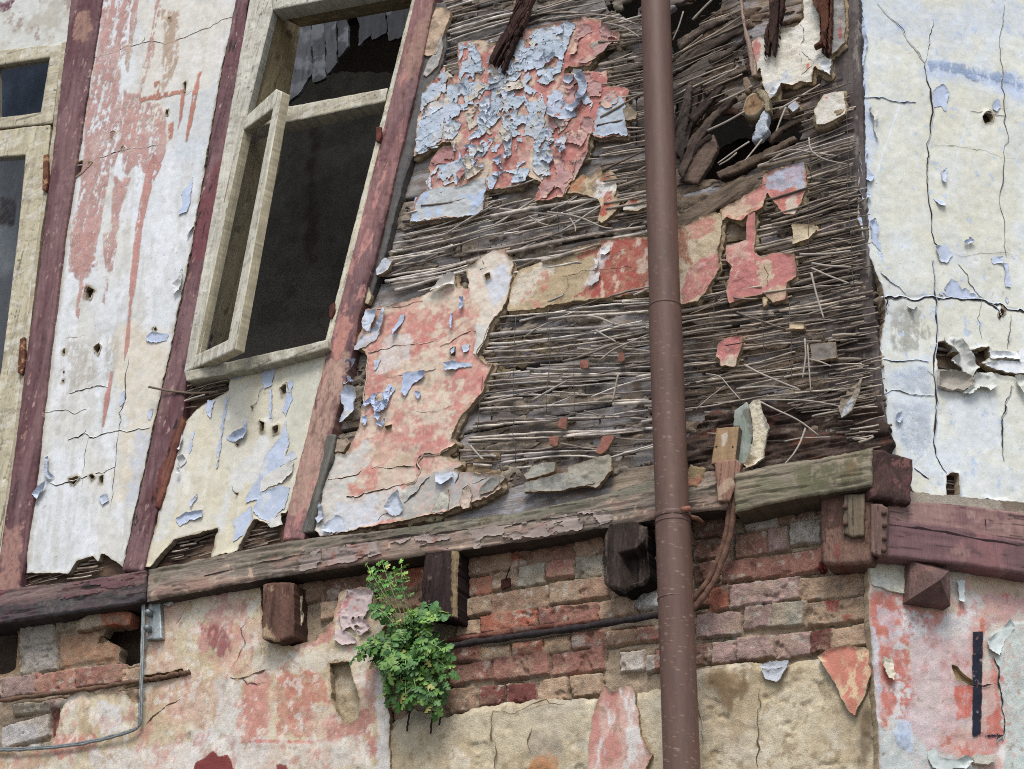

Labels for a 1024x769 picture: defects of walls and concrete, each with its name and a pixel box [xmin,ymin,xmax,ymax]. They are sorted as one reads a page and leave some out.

flaking render [376,0,653,516]
spalling [672,0,903,463]
crack [864,4,1024,479]
crack [45,359,150,500]
flaking render [156,532,218,568]
flaking render [148,376,248,474]
peeling [233,368,297,550]
peeling [315,502,349,533]
flaking render [335,438,351,454]
peeling [339,288,425,426]
crack [204,448,600,576]
peeling [944,336,1024,394]